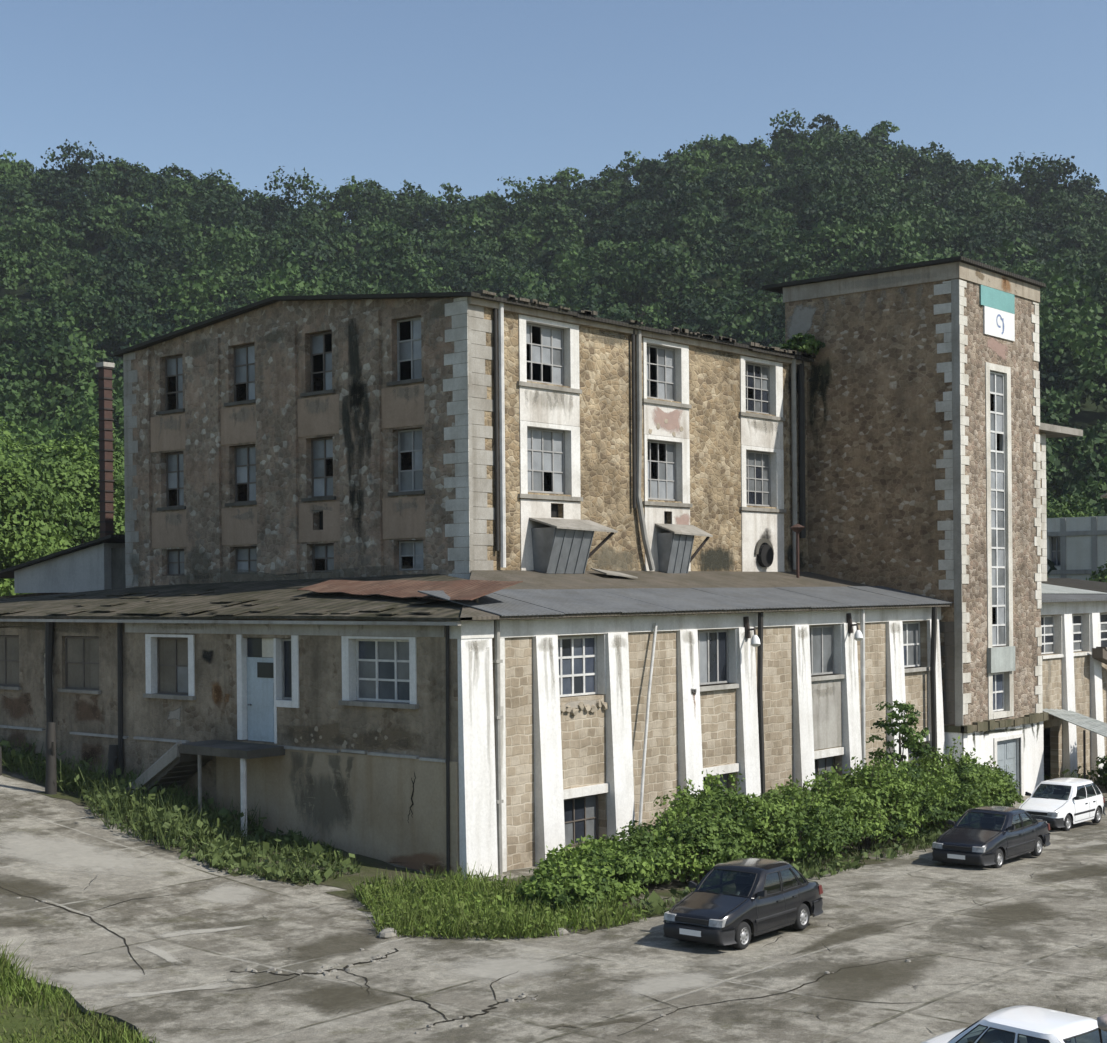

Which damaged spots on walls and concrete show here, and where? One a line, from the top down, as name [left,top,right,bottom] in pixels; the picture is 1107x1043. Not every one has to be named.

damp [342,319,371,551]
peeling [649,407,684,437]
crack [407,773,416,823]
crack [0,886,206,974]
crack [215,948,538,1034]